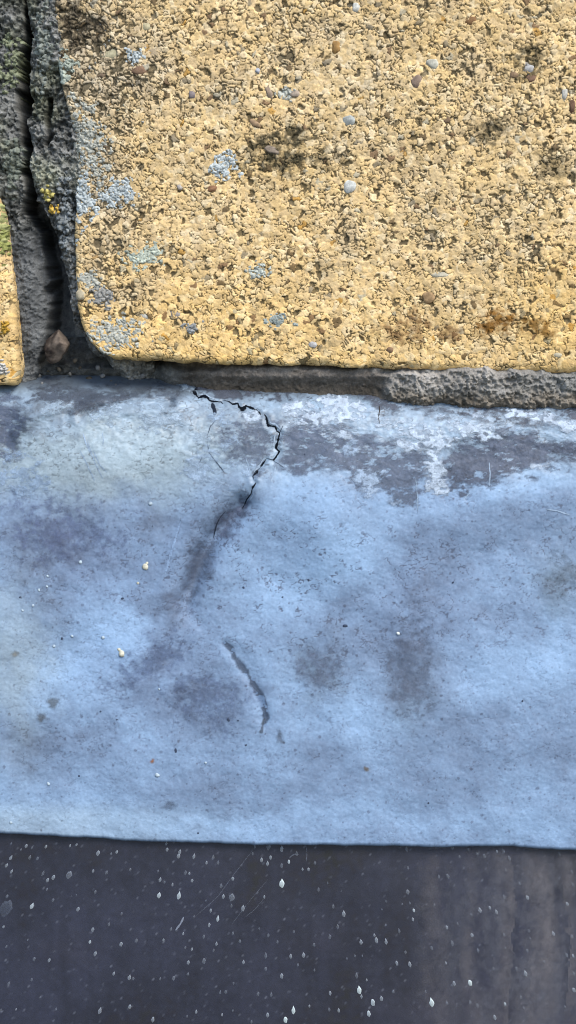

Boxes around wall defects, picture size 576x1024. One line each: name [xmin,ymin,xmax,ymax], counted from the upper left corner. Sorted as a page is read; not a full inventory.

crack [192,387,283,538]